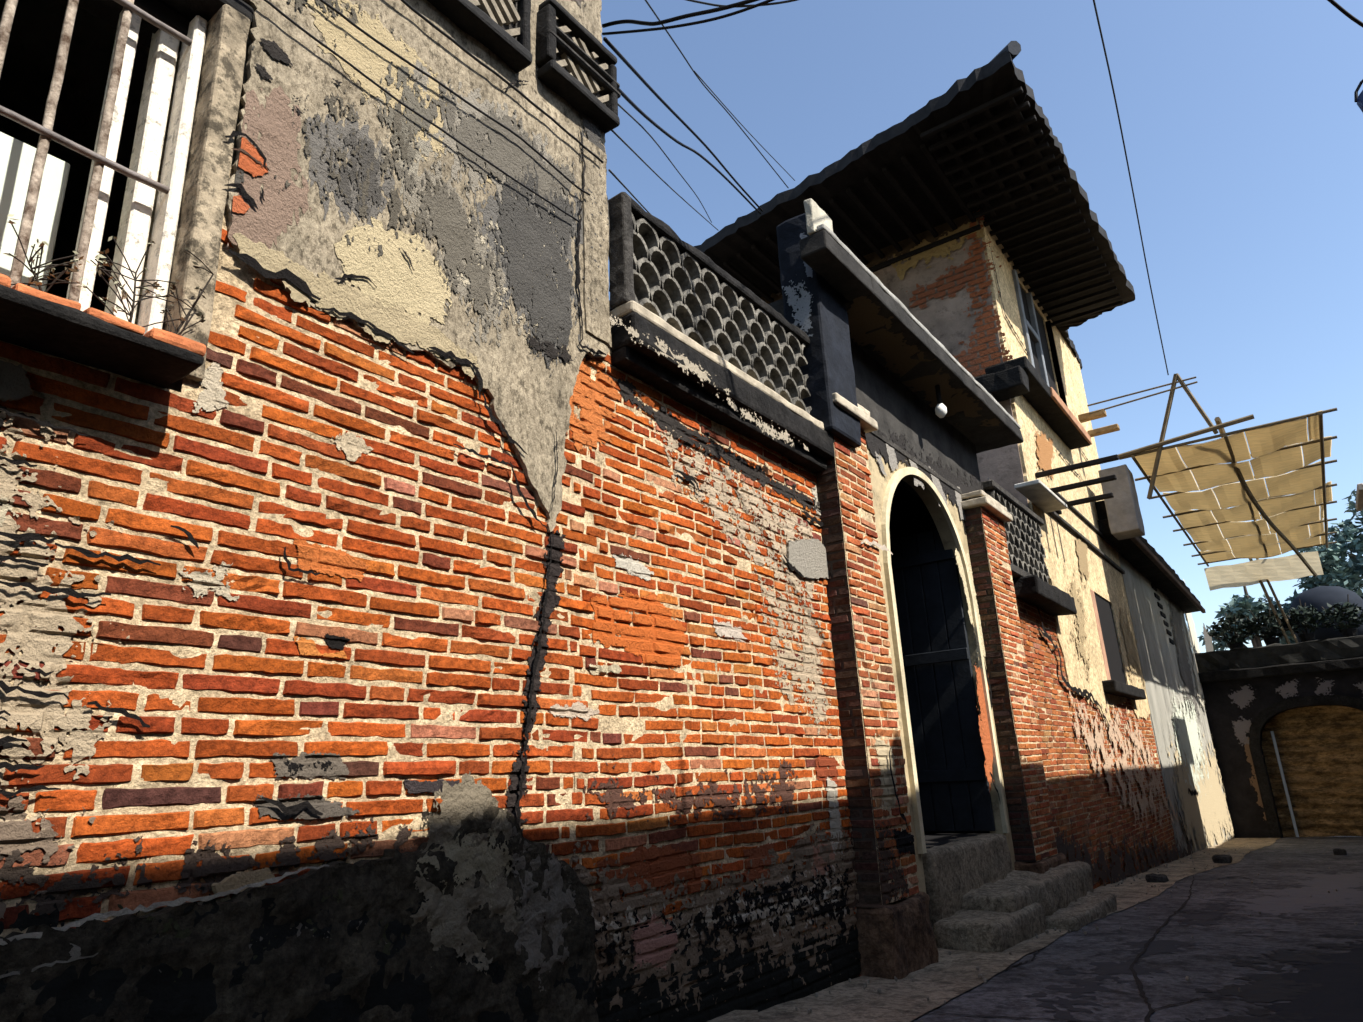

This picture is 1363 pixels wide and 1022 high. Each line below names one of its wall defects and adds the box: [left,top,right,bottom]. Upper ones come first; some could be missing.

spalling [254,38,293,80]
peeling [305,0,462,161]
spalling [238,137,268,177]
spalling [232,195,250,214]
spalling [906,209,1013,377]
peeling [232,216,621,454]
peeling [609,314,809,451]
crack [229,249,558,826]
peeling [1228,684,1256,746]
water stain [0,832,160,915]
water stain [173,814,379,897]
water stain [394,824,416,851]